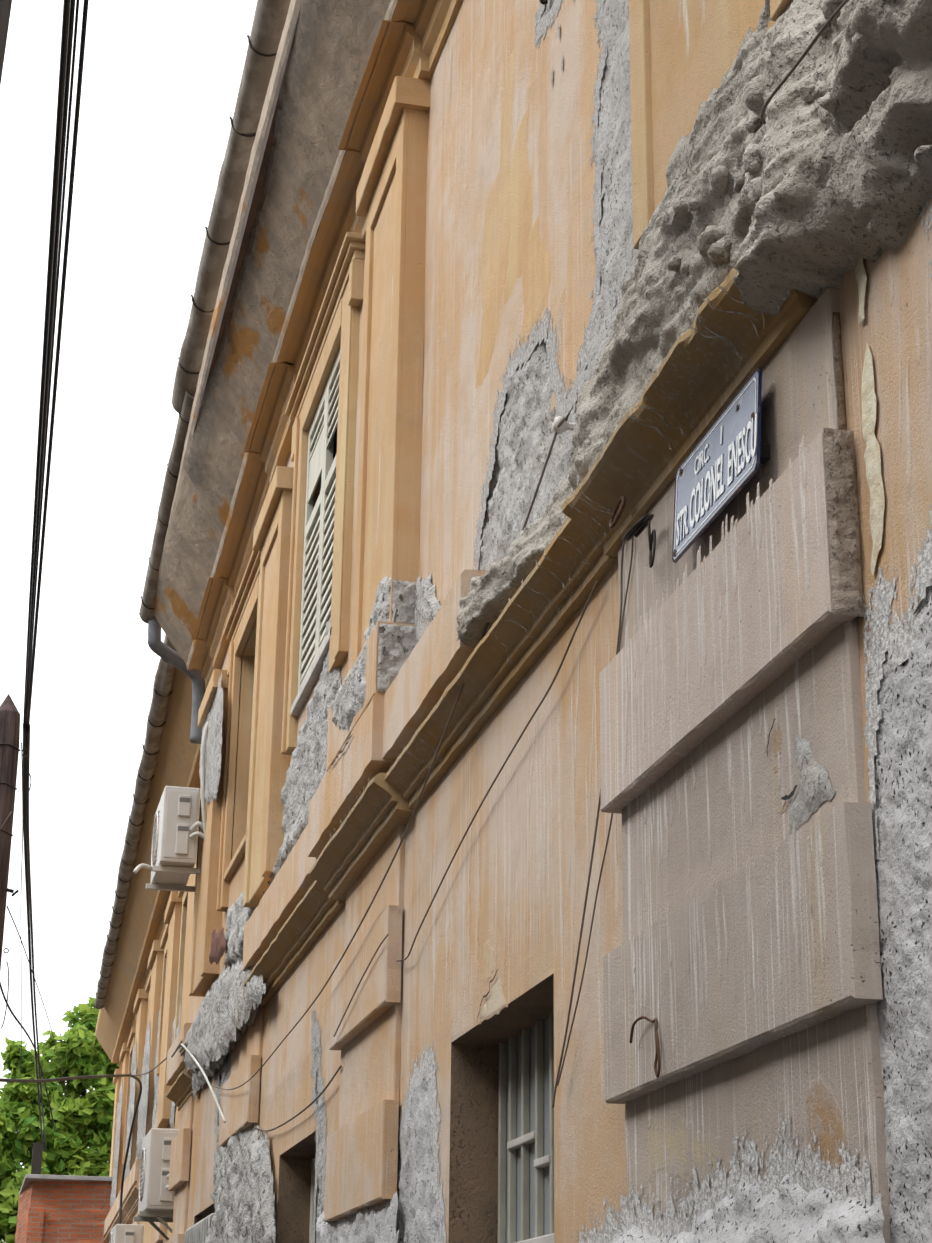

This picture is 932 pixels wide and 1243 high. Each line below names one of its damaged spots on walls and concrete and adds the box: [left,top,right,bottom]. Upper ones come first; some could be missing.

flaking render [473,0,639,570]
peeling [855,256,867,325]
flaking render [110,573,446,1243]
peeling [479,941,508,1024]
flaking render [570,312,932,1243]